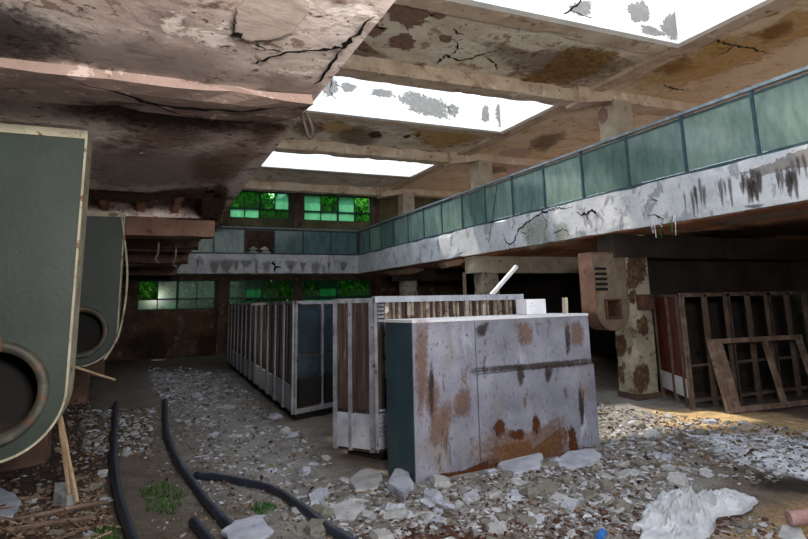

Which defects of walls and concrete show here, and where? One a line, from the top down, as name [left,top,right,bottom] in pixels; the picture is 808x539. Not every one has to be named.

crack [230,16,375,99]
crack [434,29,498,70]
damp [499,48,629,85]
crack [715,39,767,56]
damp [776,156,807,195]
spalling [88,179,242,233]
damp [680,170,808,238]
crack [504,207,617,251]